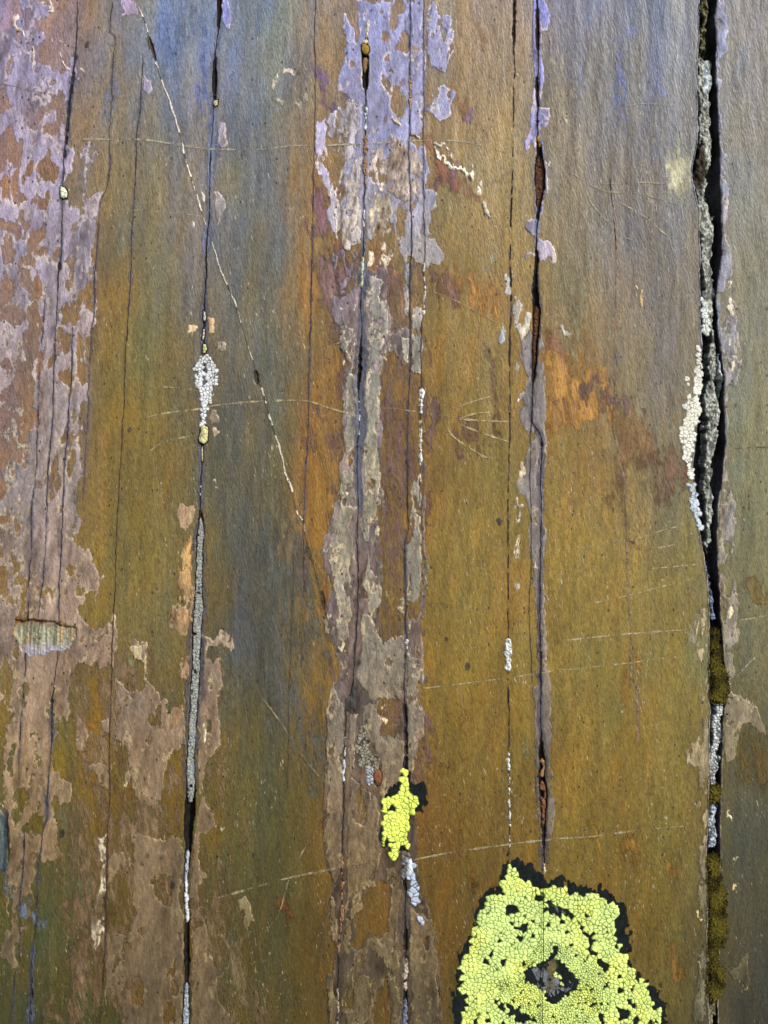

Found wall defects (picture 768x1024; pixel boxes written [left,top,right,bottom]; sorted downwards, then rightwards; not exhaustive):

spalling [0,805,9,872]
spalling [13,616,77,657]
crack [12,0,330,1024]
spalling [345,688,358,712]
crack [335,36,370,1024]
crack [400,847,410,1015]
crack [403,0,426,769]
crack [507,0,549,1024]
crack [691,0,728,1024]